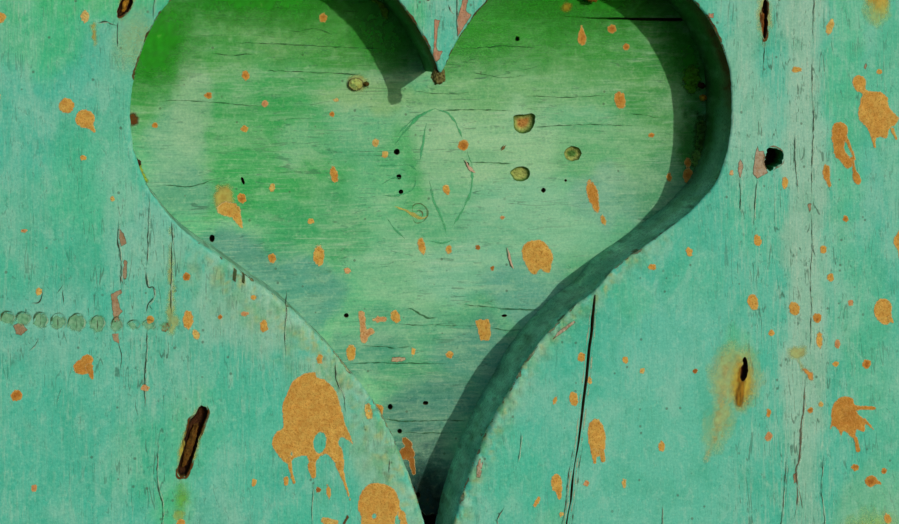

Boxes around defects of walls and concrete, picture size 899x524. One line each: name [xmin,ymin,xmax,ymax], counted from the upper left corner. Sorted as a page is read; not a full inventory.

peeling [422,19,452,62]
peeling [738,146,768,178]
peeling [111,290,122,322]
rust [716,355,752,425]